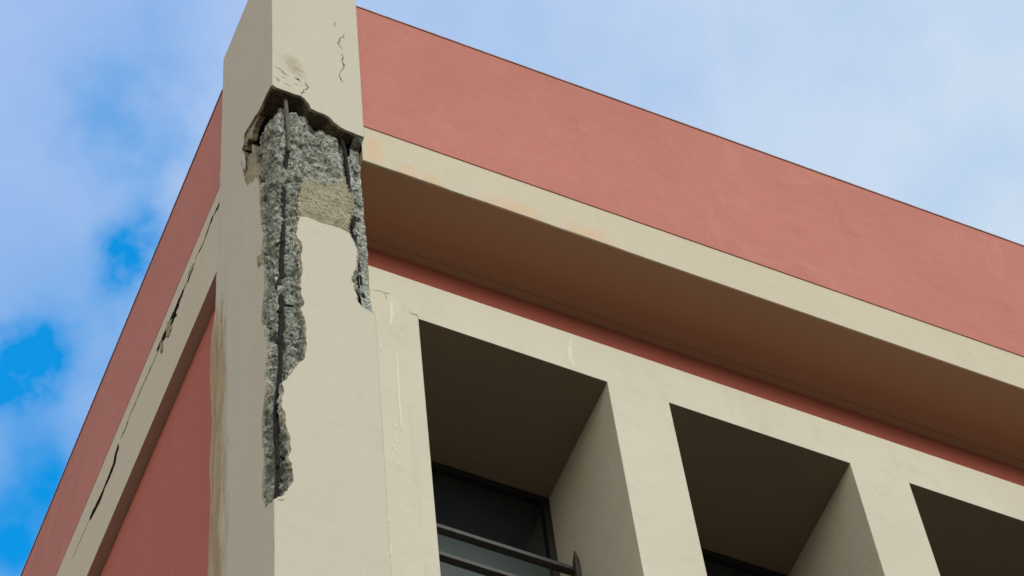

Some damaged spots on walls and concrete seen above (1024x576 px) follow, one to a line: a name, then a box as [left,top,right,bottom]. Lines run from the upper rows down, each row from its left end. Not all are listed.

crack [334,22,345,82]
spalling [241,45,375,509]
crack [121,352,158,437]